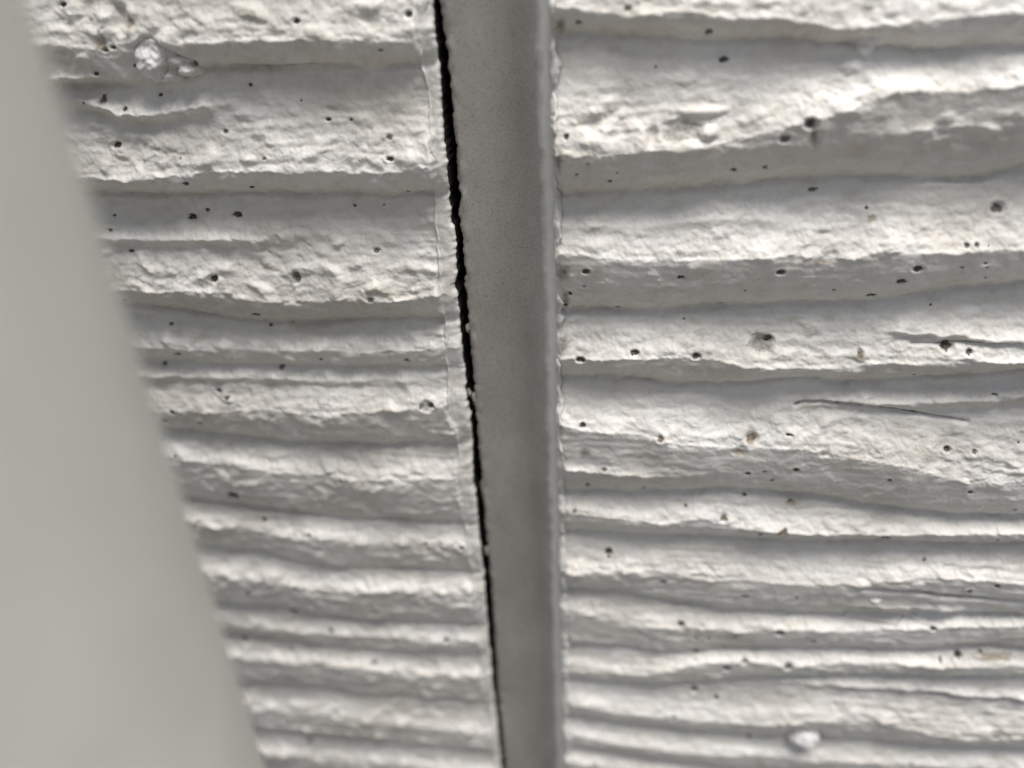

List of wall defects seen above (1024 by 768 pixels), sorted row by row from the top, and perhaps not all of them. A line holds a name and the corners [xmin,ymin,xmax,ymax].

crack [422,0,506,768]